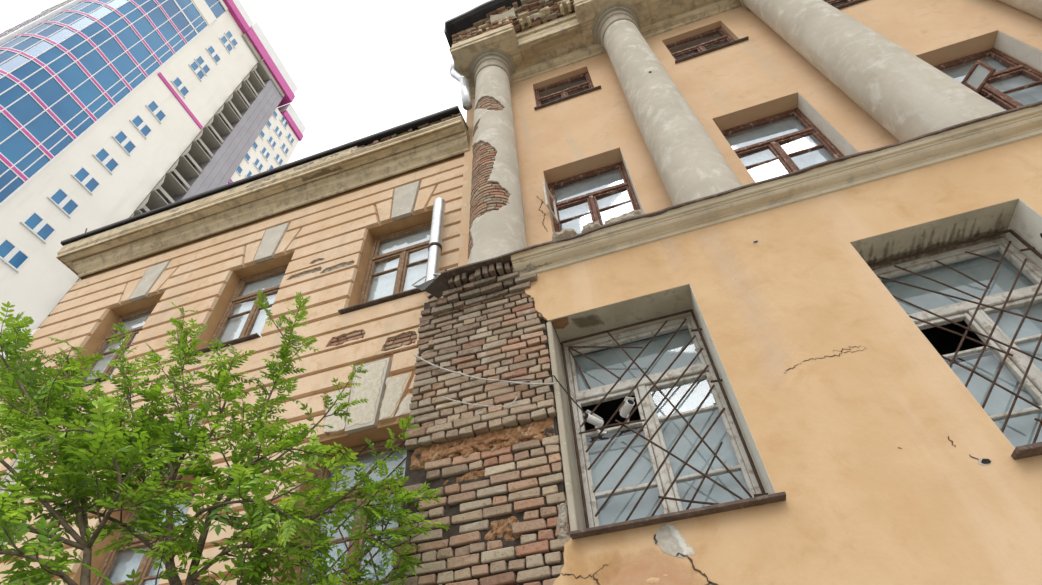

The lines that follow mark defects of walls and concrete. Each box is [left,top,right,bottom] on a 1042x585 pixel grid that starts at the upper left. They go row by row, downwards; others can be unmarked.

peeling [490,0,549,26]
spalling [476,97,504,111]
spalling [290,113,510,259]
spalling [289,259,354,280]
crack [784,346,866,374]
flaking render [323,290,599,585]
crack [653,534,718,585]
crack [561,564,607,585]